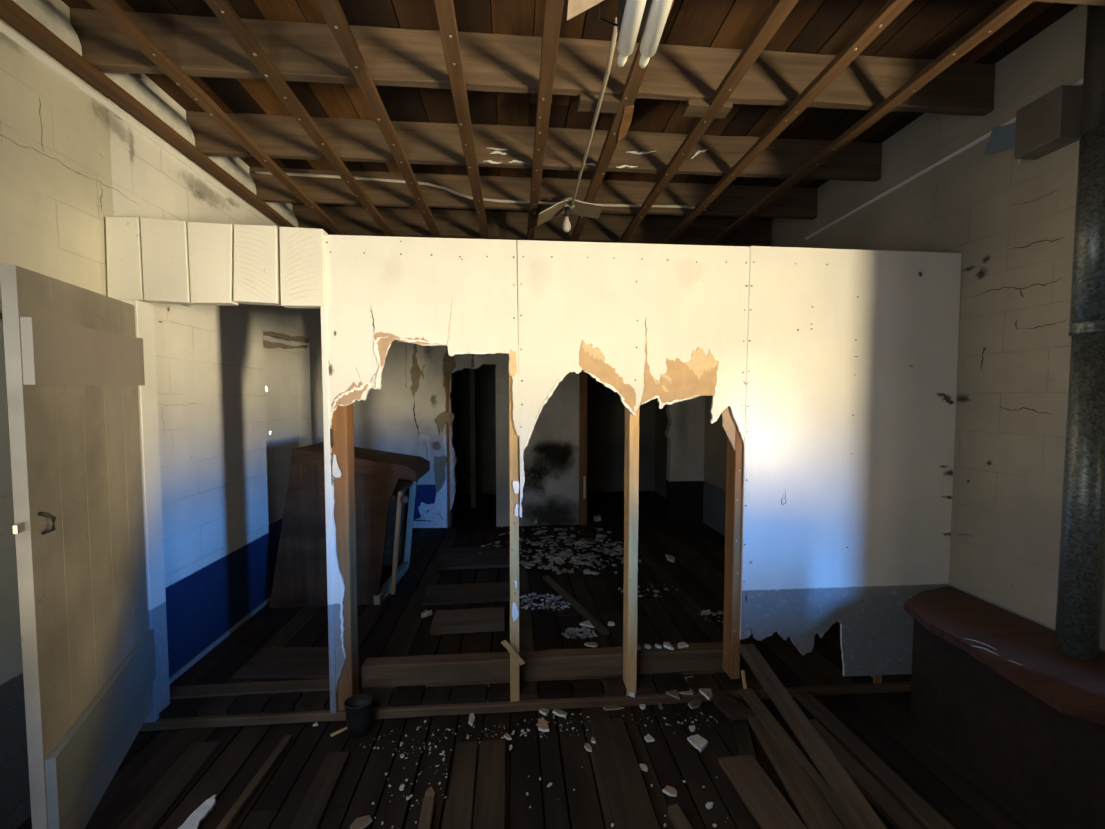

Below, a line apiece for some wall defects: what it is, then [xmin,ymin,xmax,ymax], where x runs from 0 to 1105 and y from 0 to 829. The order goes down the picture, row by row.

crack [0,97,139,211]
crack [1012,237,1064,249]
crack [969,278,1066,329]
spalling [535,369,699,424]
flaking render [410,344,494,529]
water stain [519,443,571,490]
water stain [525,500,577,527]